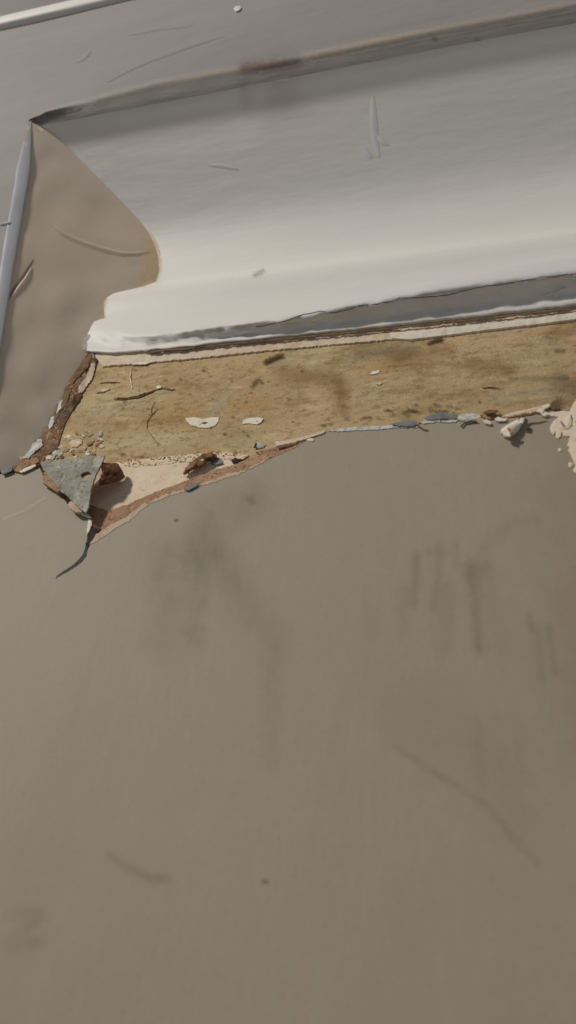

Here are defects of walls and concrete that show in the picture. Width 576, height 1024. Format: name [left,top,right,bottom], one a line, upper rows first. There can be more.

peeling [0,306,576,545]